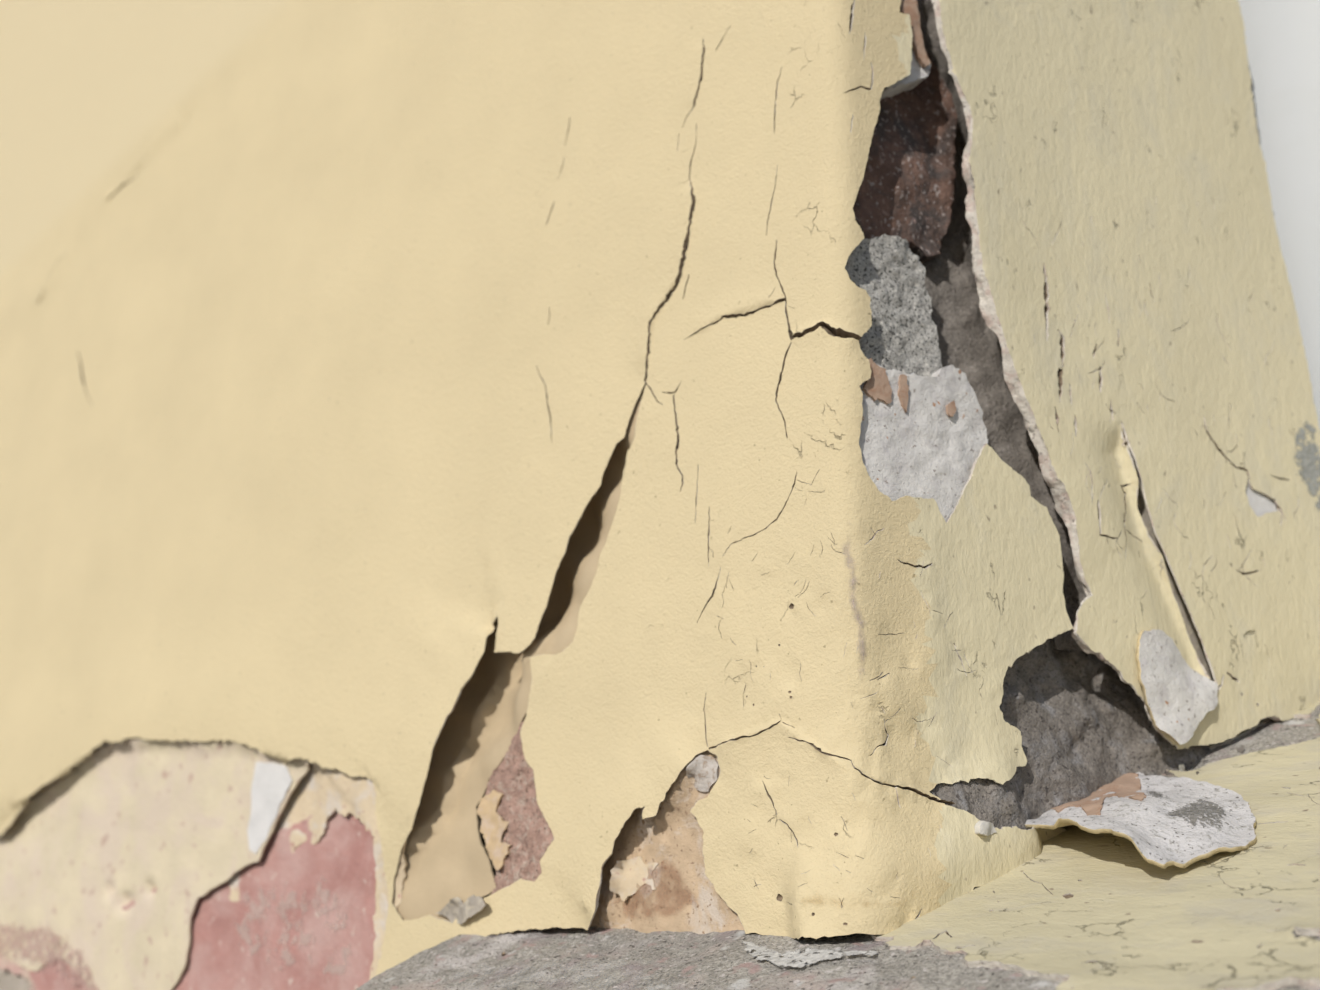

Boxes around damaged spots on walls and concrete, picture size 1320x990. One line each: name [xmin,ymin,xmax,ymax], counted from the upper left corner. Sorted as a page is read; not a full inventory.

crack [537,368,552,440]
crack [644,0,1173,858]
flaking render [0,383,649,990]
flaking render [921,448,1227,836]
crack [1186,537,1258,575]
flaking render [590,743,878,968]
crack [747,776,808,904]